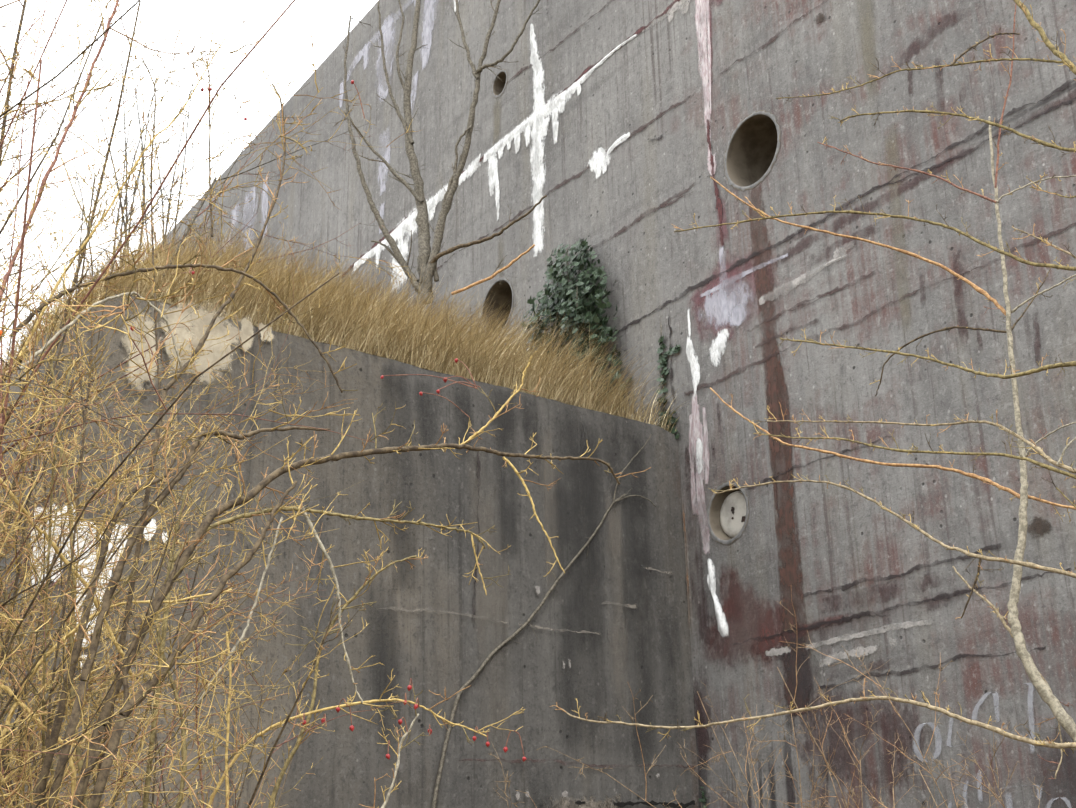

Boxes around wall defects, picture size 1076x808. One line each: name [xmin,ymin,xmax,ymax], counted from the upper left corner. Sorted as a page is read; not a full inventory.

corrosion [900,148,972,192]
corrosion [692,185,924,791]
spalling [556,791,621,808]
crack [613,800,695,808]